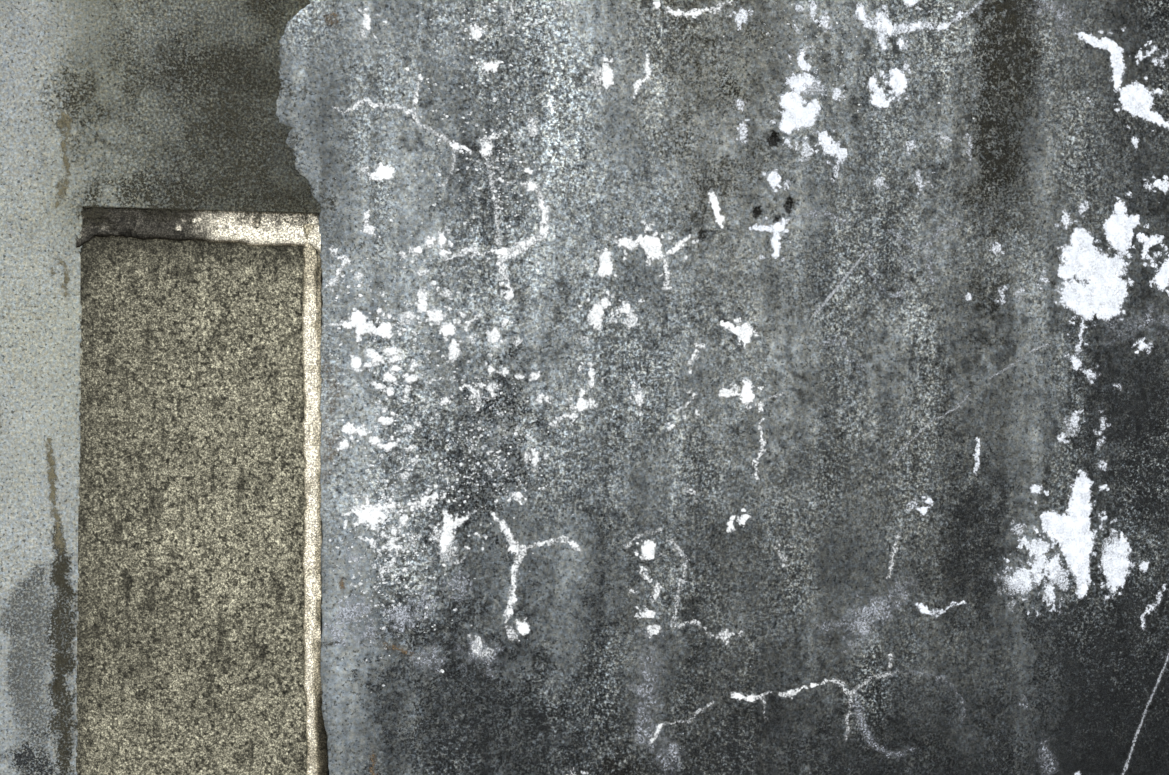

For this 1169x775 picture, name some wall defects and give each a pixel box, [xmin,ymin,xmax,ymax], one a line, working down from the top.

water stain [42,62,113,161]
water stain [70,0,335,228]
water stain [449,125,511,193]
water stain [424,343,549,561]
water stain [1042,314,1169,549]
water stain [1,525,80,775]
crack [491,512,580,623]
crack [650,724,663,743]
water stain [352,447,1169,775]
crack [696,679,859,728]
crack [1140,584,1166,629]